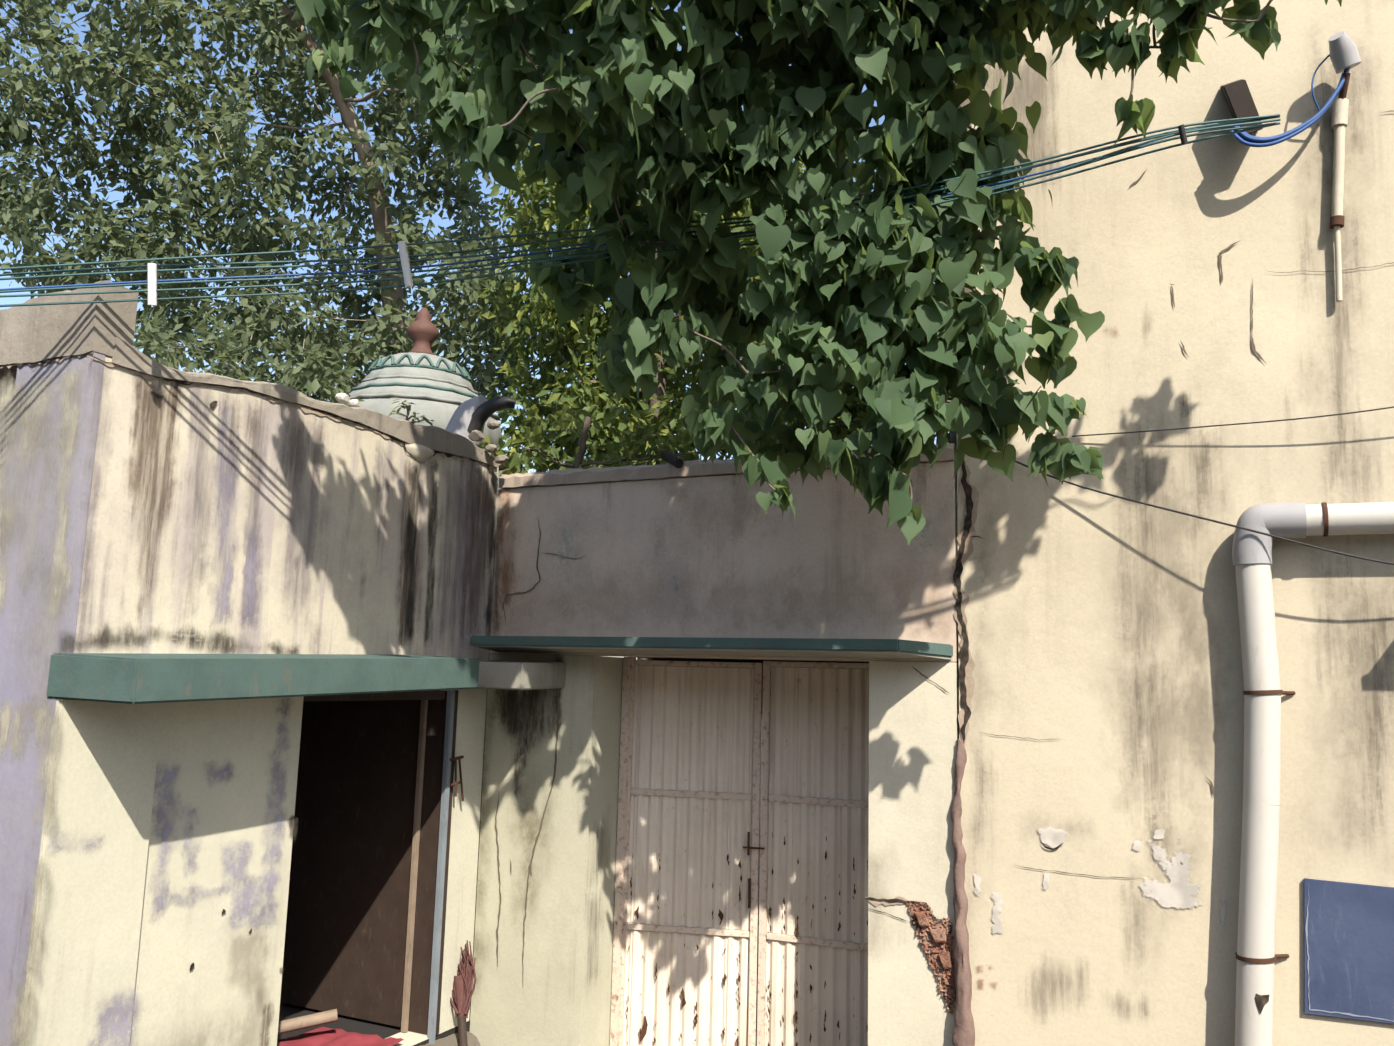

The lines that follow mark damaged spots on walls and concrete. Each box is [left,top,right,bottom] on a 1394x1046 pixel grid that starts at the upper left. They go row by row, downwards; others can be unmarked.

water stain [91,628,144,647]
water stain [130,381,261,653]
water stain [399,464,513,642]
crack [496,519,586,624]
crack [913,459,1048,746]
water stain [500,688,561,780]
crack [495,692,559,967]
peeling [1038,826,1068,850]
peeling [1133,829,1204,909]
corrosion [626,945,698,1045]
corrosion [767,858,868,1046]
flaking render [906,900,956,1013]